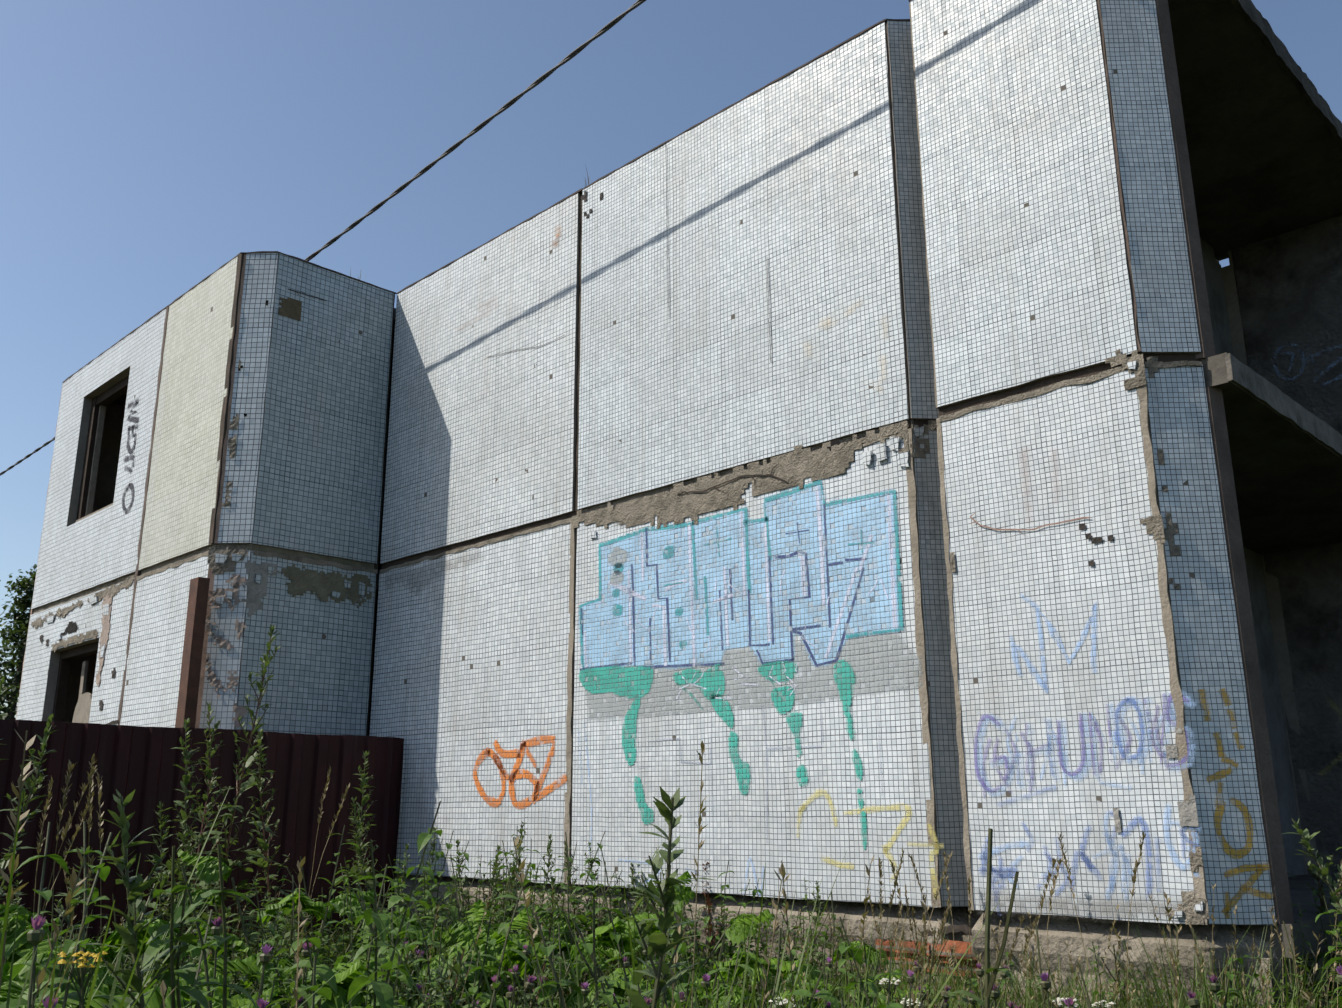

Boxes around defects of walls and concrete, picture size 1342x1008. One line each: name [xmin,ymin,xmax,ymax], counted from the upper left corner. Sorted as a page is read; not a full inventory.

spalling [266,297,302,321]
spalling [572,420,937,539]
spalling [31,575,136,710]
peeling [205,547,372,727]